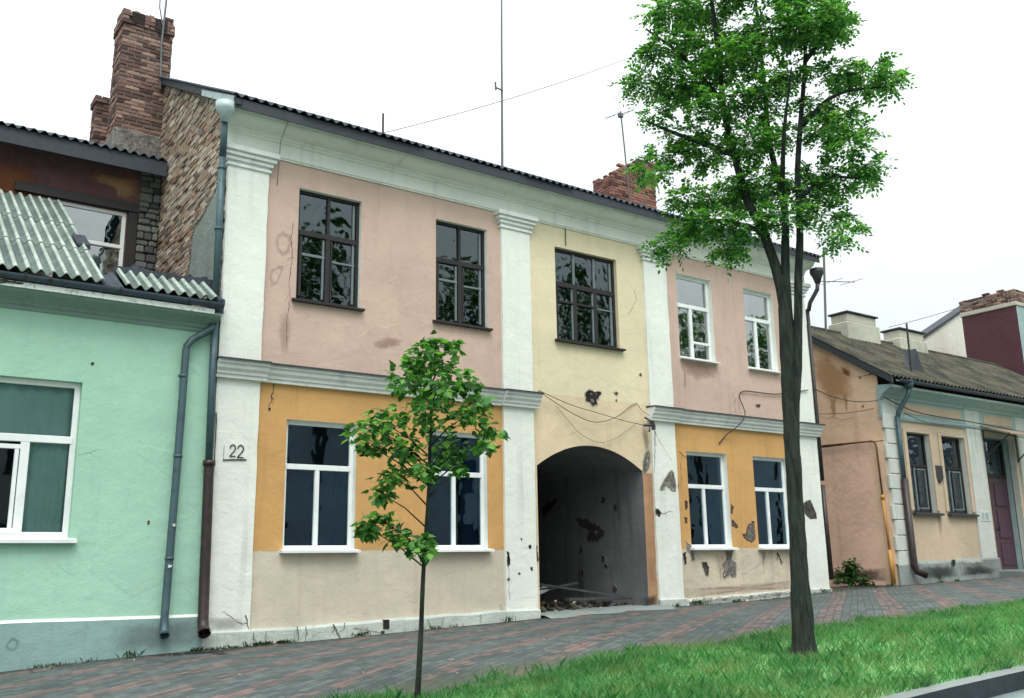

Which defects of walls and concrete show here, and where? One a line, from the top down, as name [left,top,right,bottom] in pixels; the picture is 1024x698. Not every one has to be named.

water stain [818,362,849,413]
spalling [642,450,651,474]
spalling [659,470,688,523]
spalling [731,504,756,543]
spalling [803,500,817,519]
spalling [576,518,608,569]
spalling [682,541,737,580]